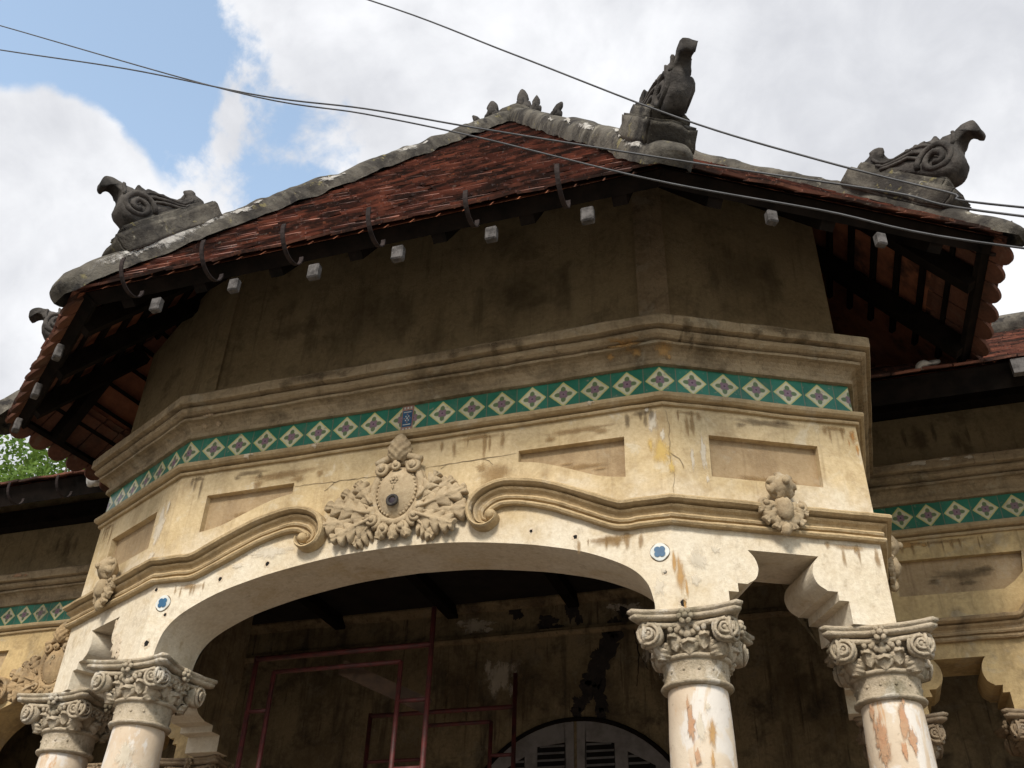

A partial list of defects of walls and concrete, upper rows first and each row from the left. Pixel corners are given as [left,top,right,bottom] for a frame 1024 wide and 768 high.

crack [427,453,515,469]
peeling [570,602,641,719]
peeling [686,697,716,768]
peeling [869,698,918,768]